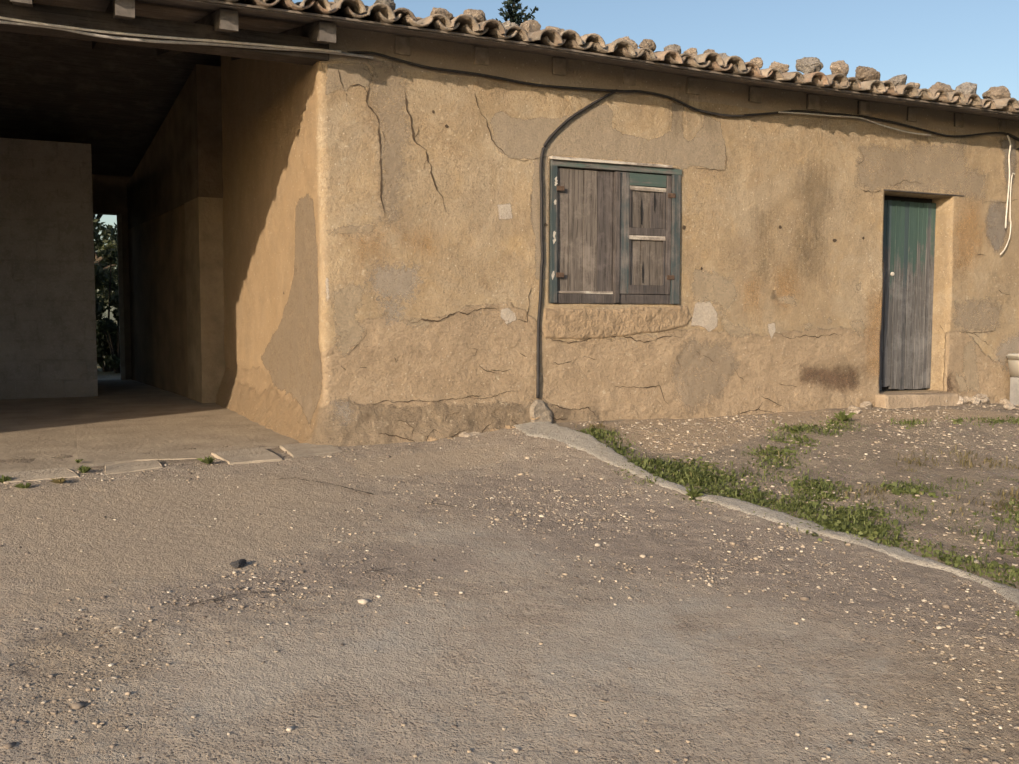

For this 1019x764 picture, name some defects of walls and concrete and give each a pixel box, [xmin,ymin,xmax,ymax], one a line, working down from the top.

crack [338,67,446,224]
crack [475,95,537,161]
spalling [491,102,726,279]
crack [414,308,496,323]
peeling [683,301,718,332]
crack [364,348,526,442]
crack [554,331,744,381]
crack [740,384,796,414]
water stain [801,368,856,389]